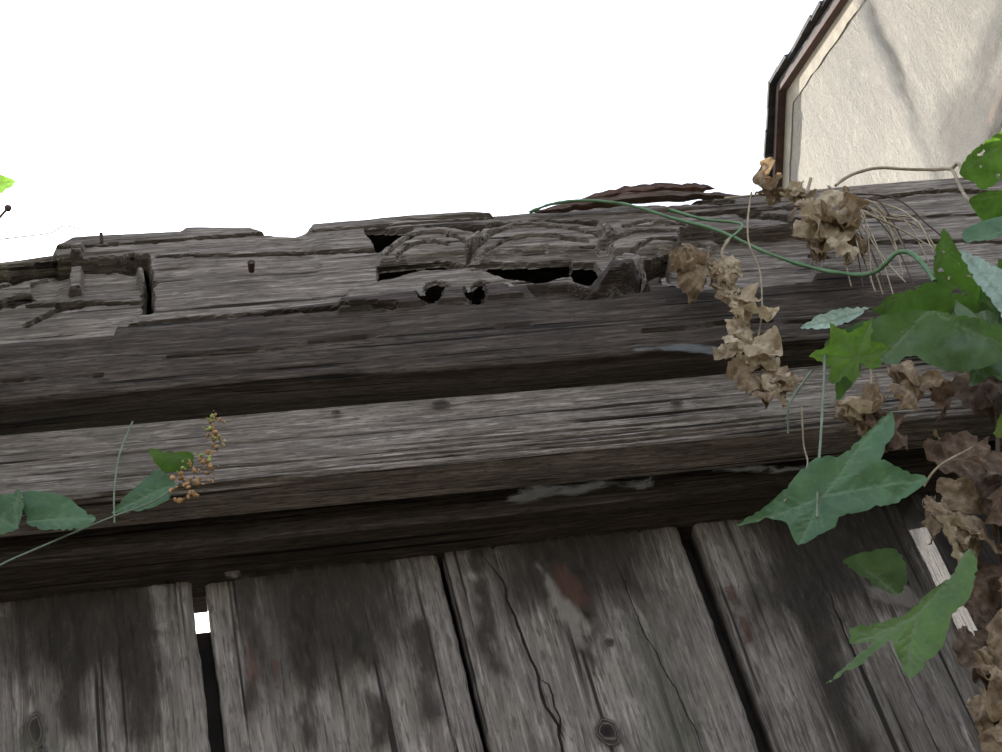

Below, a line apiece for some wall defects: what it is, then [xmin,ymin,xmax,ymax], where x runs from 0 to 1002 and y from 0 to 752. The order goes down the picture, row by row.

crack [480,547,565,752]